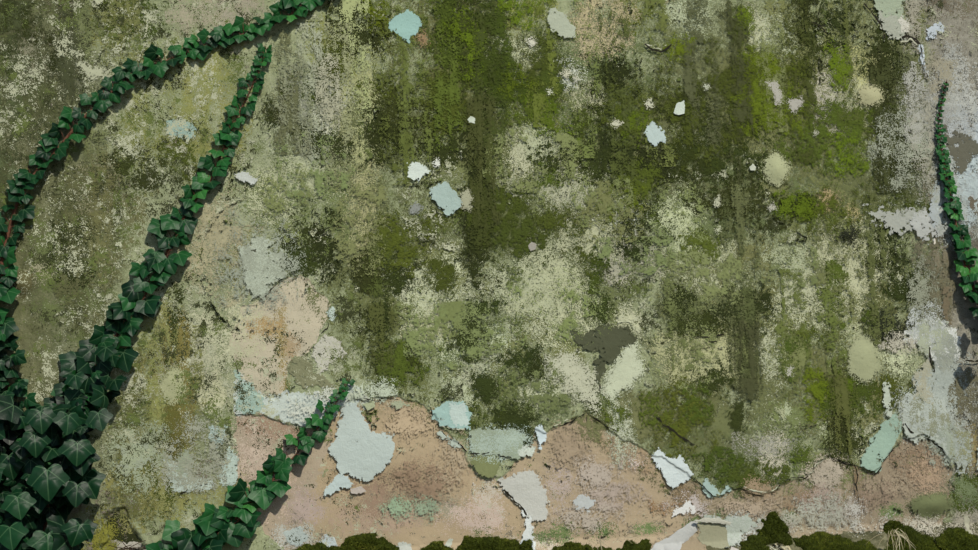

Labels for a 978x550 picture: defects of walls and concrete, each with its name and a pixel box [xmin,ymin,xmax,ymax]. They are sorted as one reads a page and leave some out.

peeling [388,9,422,43]
peeling [644,121,666,147]
peeling [407,162,431,181]
peeling [429,181,463,217]
peeling [229,275,331,397]
crack [656,417,702,449]
water stain [241,393,522,550]
peeling [233,396,953,550]
crack [694,423,951,513]
water stain [533,534,567,550]